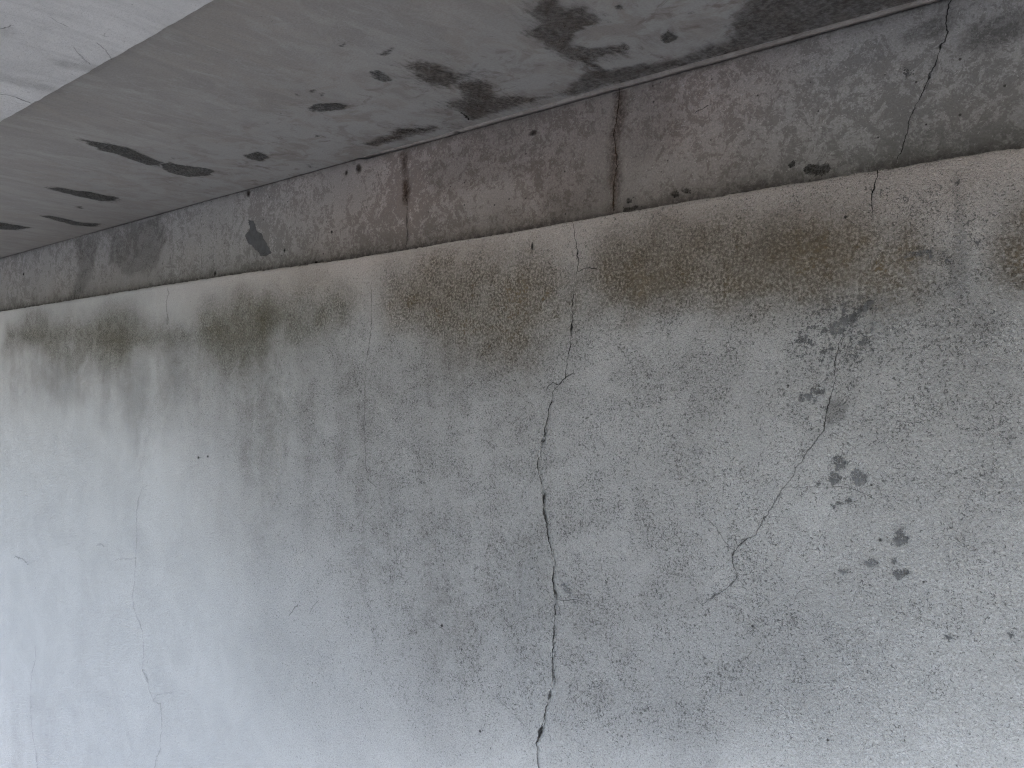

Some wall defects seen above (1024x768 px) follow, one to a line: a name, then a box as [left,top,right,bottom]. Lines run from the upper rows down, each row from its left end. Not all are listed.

leakage [569,0,912,94]
crack [612,88,620,208]
crack [871,1,951,214]
spalling [245,220,271,256]
leakage [388,258,572,360]
leakage [598,223,921,310]
leakage [996,214,1024,287]
crack [536,222,598,768]
crack [702,337,851,604]